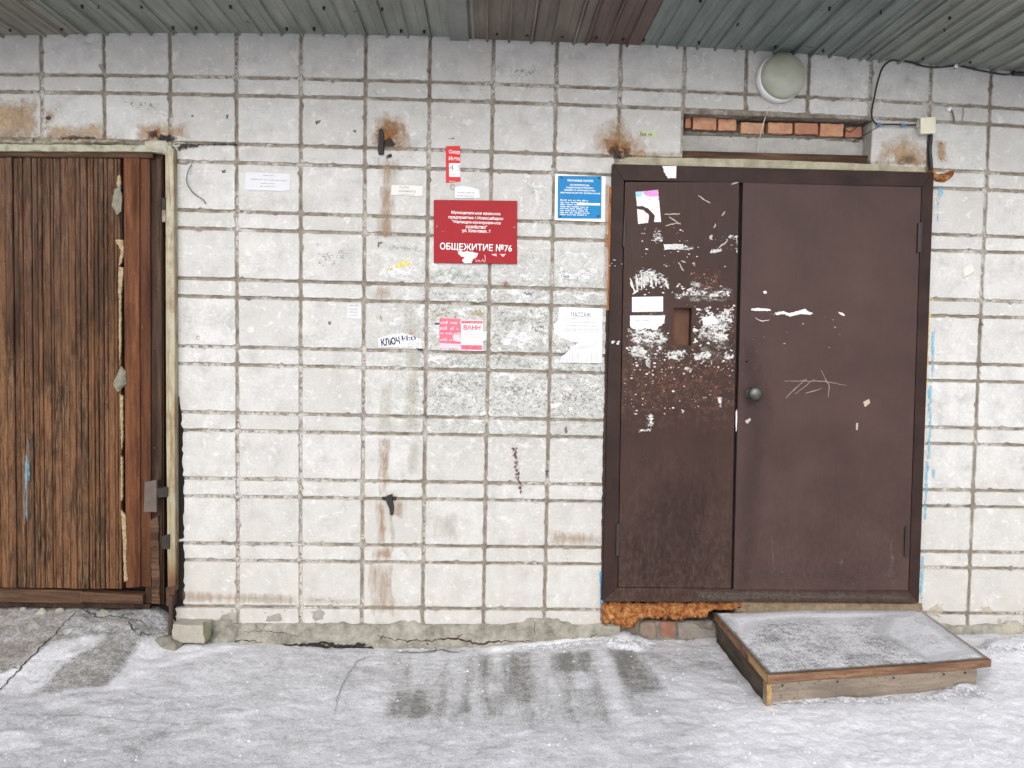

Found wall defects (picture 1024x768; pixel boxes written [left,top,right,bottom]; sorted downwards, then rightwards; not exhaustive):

corrosion [0,99,106,140]
corrosion [140,125,238,151]
corrosion [377,118,407,204]
corrosion [600,124,656,159]
corrosion [875,141,926,164]
crack [235,623,535,711]